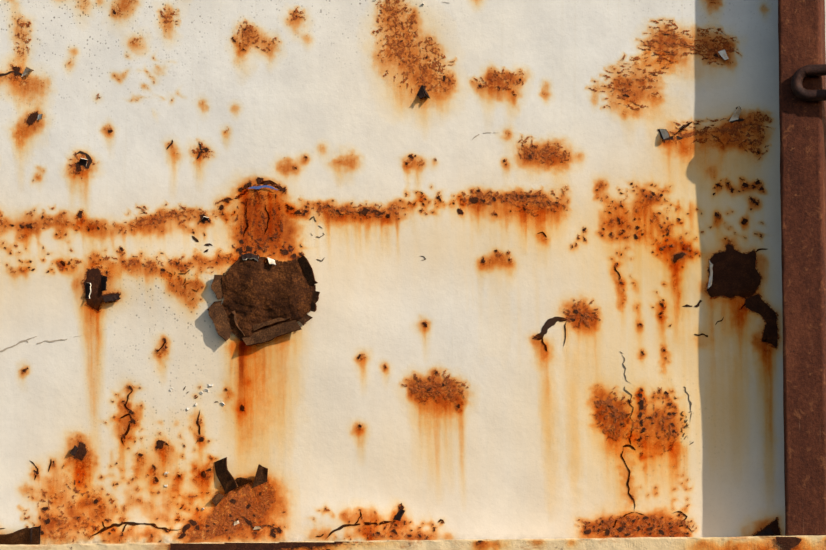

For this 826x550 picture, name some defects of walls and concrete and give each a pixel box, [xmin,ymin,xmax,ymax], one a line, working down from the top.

rust [373,0,456,99]
rust [589,19,742,110]
rust [0,177,568,277]
crack [0,335,82,352]
spalling [81,267,121,313]
spalling [168,253,324,346]
spalling [682,239,780,354]
rust [24,385,214,542]
spalling [169,457,285,542]
crack [604,352,643,531]
rust [578,499,697,538]
rust [592,384,684,457]